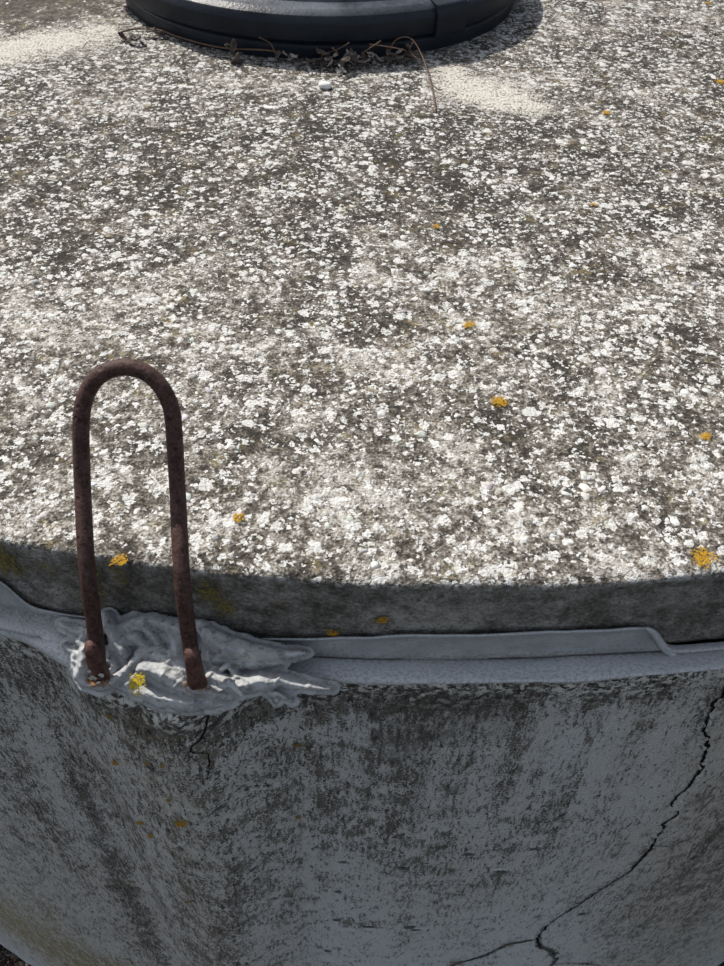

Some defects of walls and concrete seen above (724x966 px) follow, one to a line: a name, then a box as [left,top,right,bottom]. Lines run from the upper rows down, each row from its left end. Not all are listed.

crack [147,716,211,786]
crack [450,683,724,966]